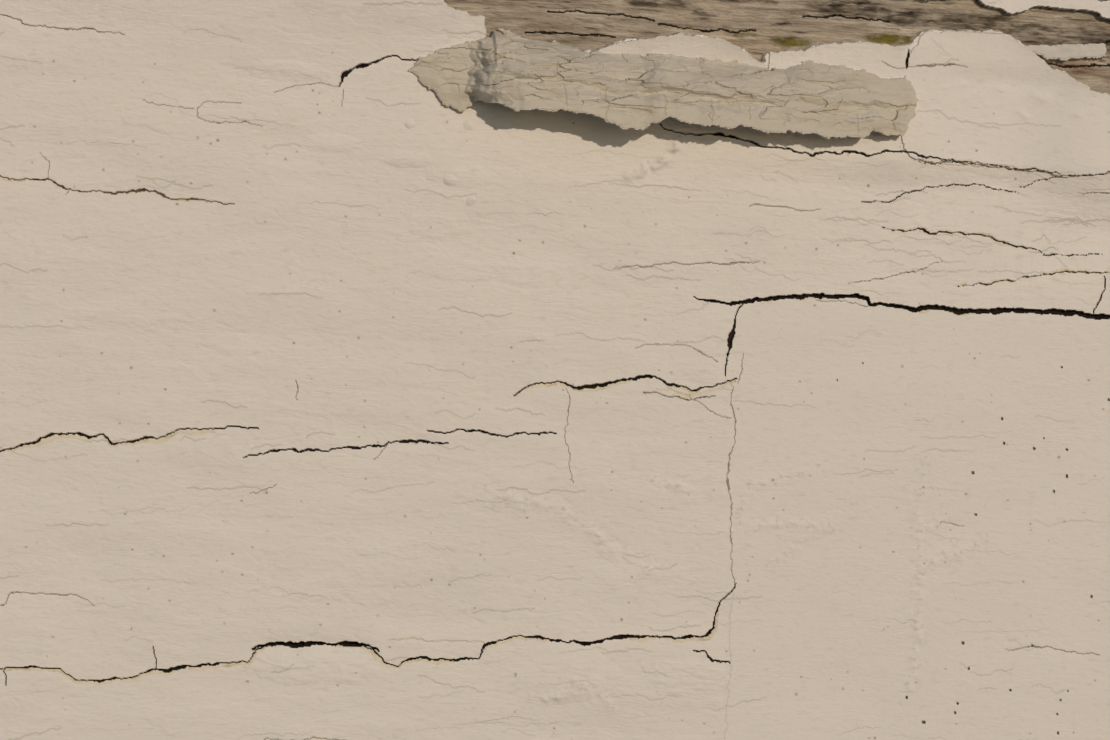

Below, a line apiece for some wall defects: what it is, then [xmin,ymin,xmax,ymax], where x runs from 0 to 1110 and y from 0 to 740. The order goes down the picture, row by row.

crack [274,56,417,107]
peeling [444,0,1110,203]
crack [0,152,233,205]
crack [615,261,760,269]
peeling [882,226,1110,287]
crack [0,276,1110,686]